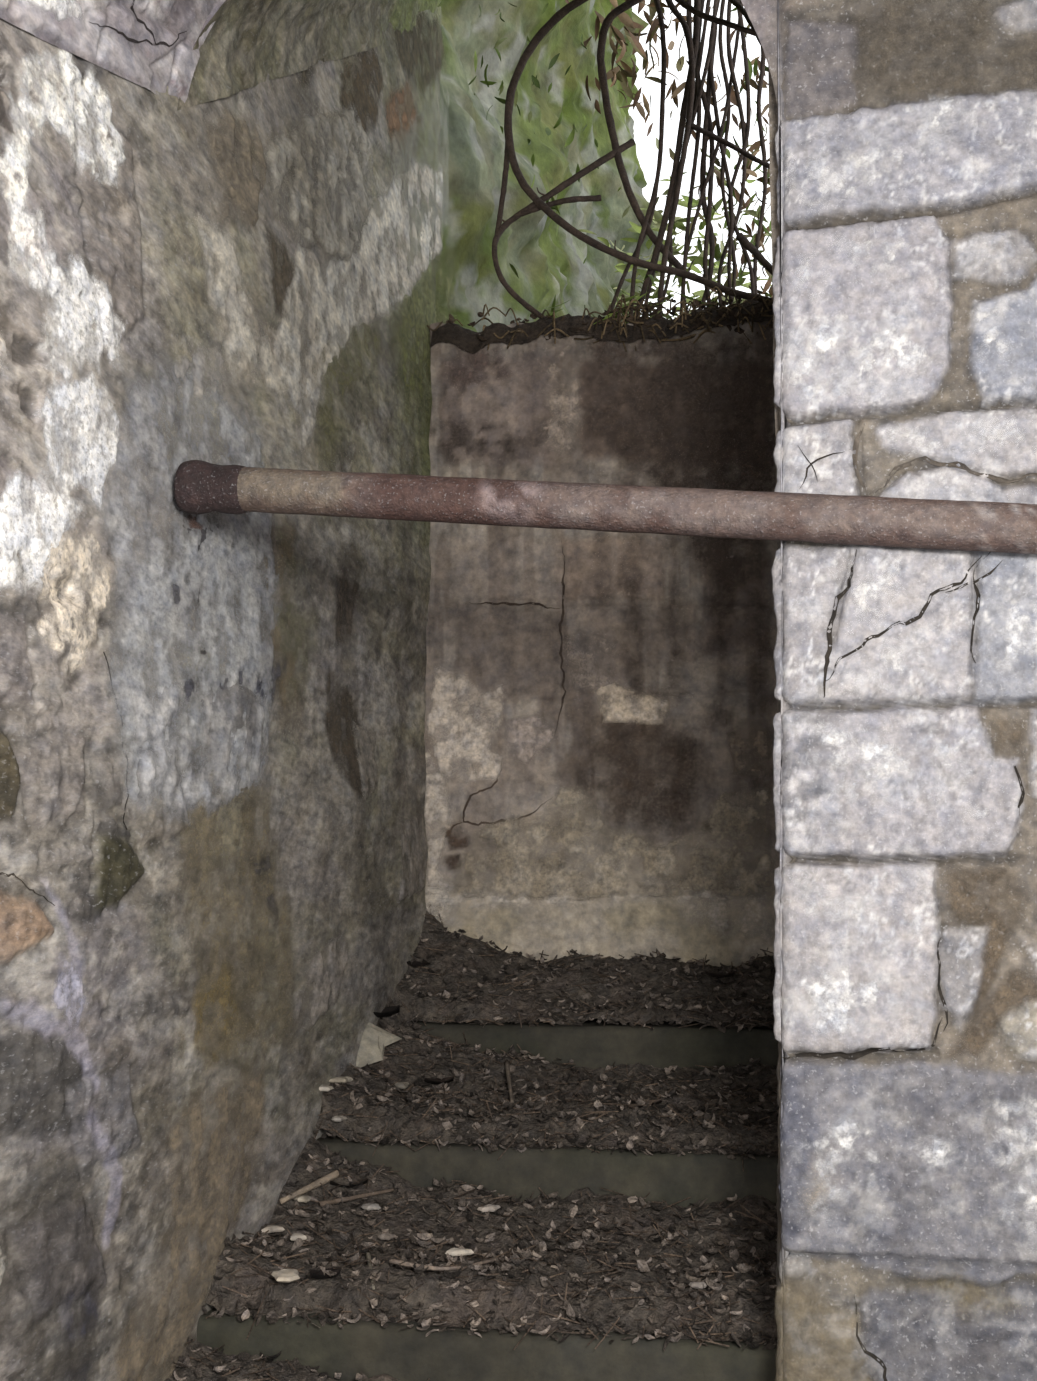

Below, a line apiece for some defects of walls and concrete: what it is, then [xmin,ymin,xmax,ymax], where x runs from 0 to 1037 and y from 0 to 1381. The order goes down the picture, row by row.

damp [450,349,507,389]
damp [442,424,515,458]
damp [534,335,776,492]
damp [688,536,761,646]
crack [822,549,1003,703]
damp [581,722,692,820]